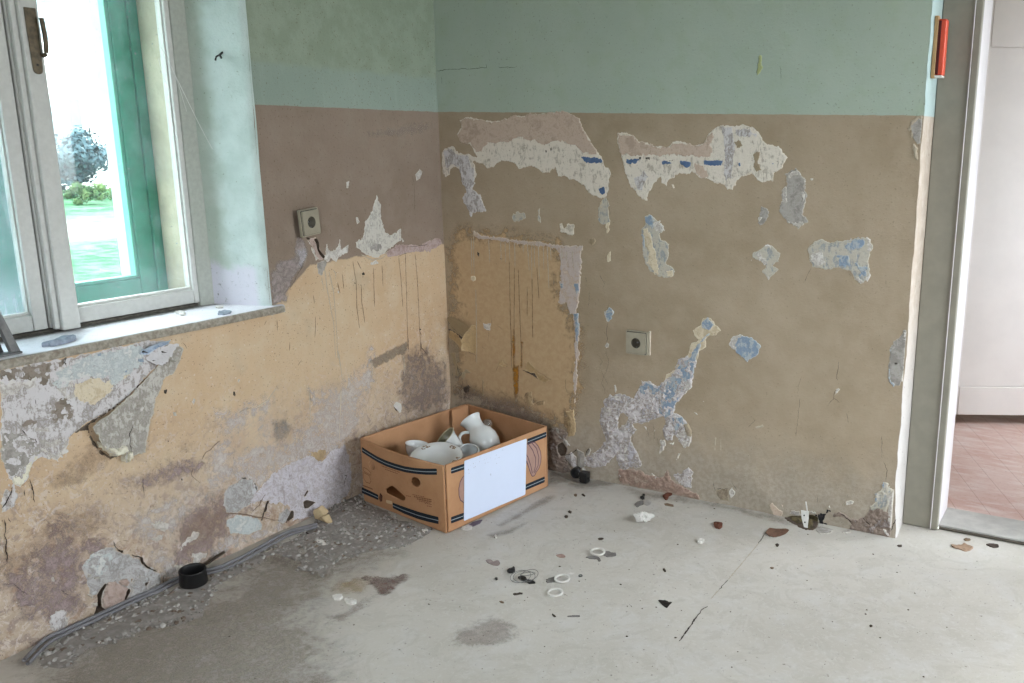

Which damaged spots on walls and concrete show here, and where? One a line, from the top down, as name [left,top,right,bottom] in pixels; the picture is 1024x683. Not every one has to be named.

peeling [617,124,813,229]
peeling [317,195,404,357]
peeling [442,111,721,473]
peeling [751,244,780,280]
peeling [805,237,873,284]
peeling [729,334,761,362]
spalling [888,330,906,387]
peeling [0,340,183,561]
water stain [139,321,446,576]
flaking render [223,477,315,535]
flaking render [785,482,896,537]